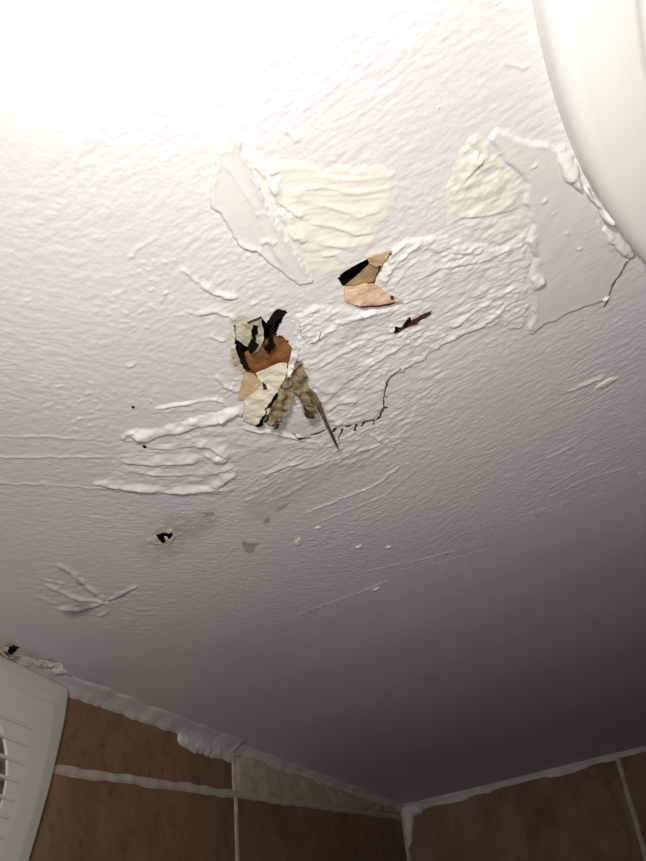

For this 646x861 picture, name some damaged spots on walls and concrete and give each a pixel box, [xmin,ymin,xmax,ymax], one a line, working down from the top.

spalling [338,250,401,308]
crack [603,262,627,307]
spalling [231,309,338,449]
crack [292,369,401,441]